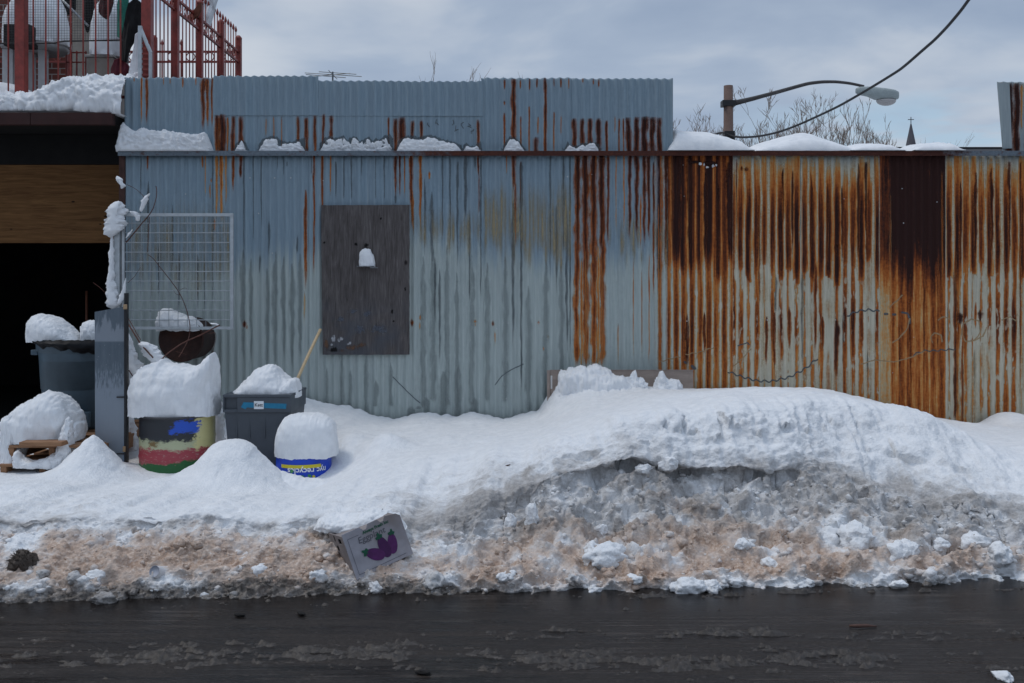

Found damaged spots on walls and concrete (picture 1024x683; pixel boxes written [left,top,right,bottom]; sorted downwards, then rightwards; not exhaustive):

corrosion [134,78,148,119]
corrosion [182,78,243,254]
corrosion [297,115,333,314]
corrosion [388,118,430,236]
corrosion [485,78,1024,423]